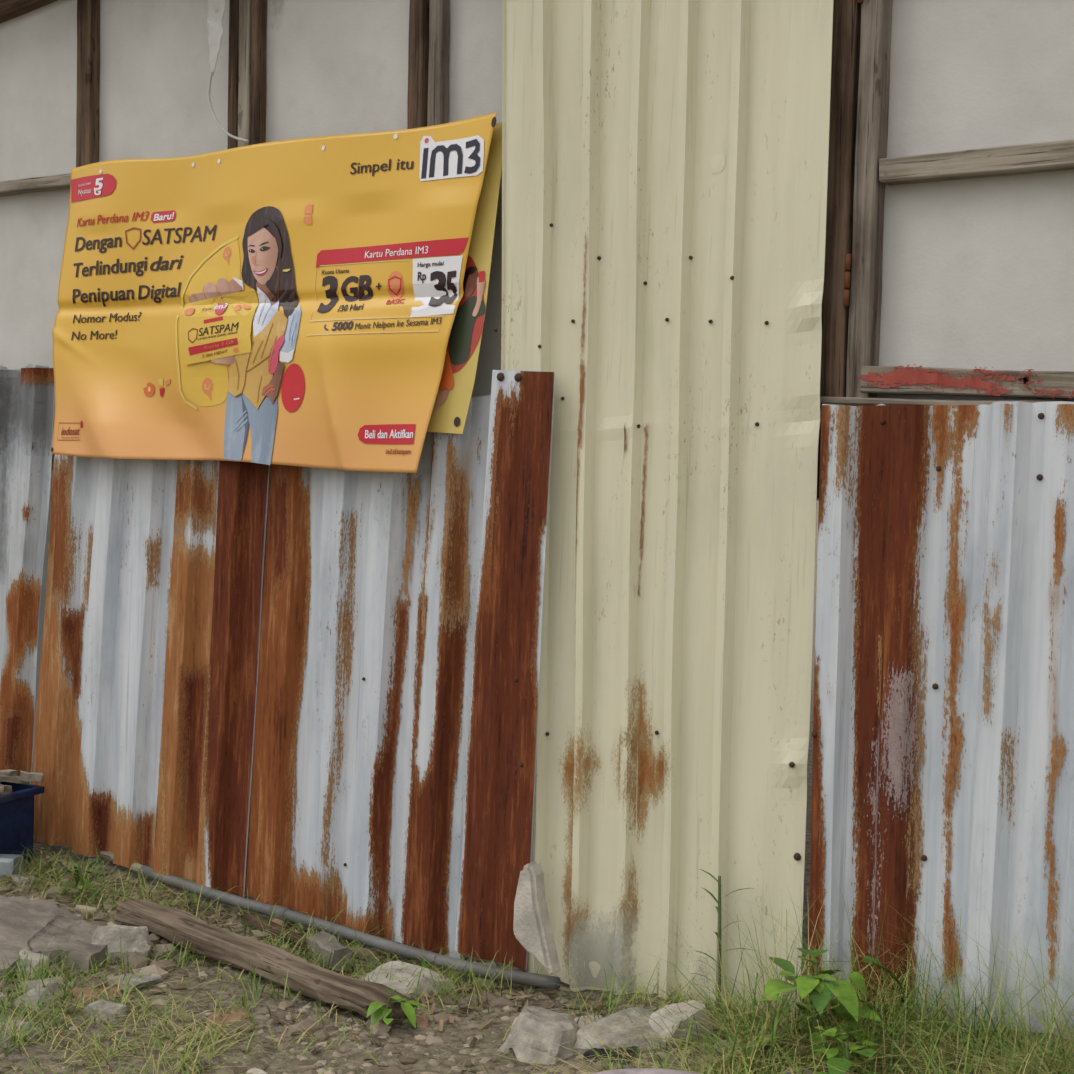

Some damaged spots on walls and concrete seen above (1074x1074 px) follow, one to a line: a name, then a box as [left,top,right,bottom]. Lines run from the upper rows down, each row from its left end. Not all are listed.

peeling [858,364,1074,399]
rust [1003,404,1017,432]
rust [1055,404,1074,441]
rust [0,368,554,970]
rust [562,734,598,953]
rust [619,868,637,936]
rust [618,682,668,835]
rust [807,657,836,979]
rust [818,404,980,1023]
rust [982,554,1020,826]
rust [1043,708,1069,985]
rust [1048,497,1068,693]